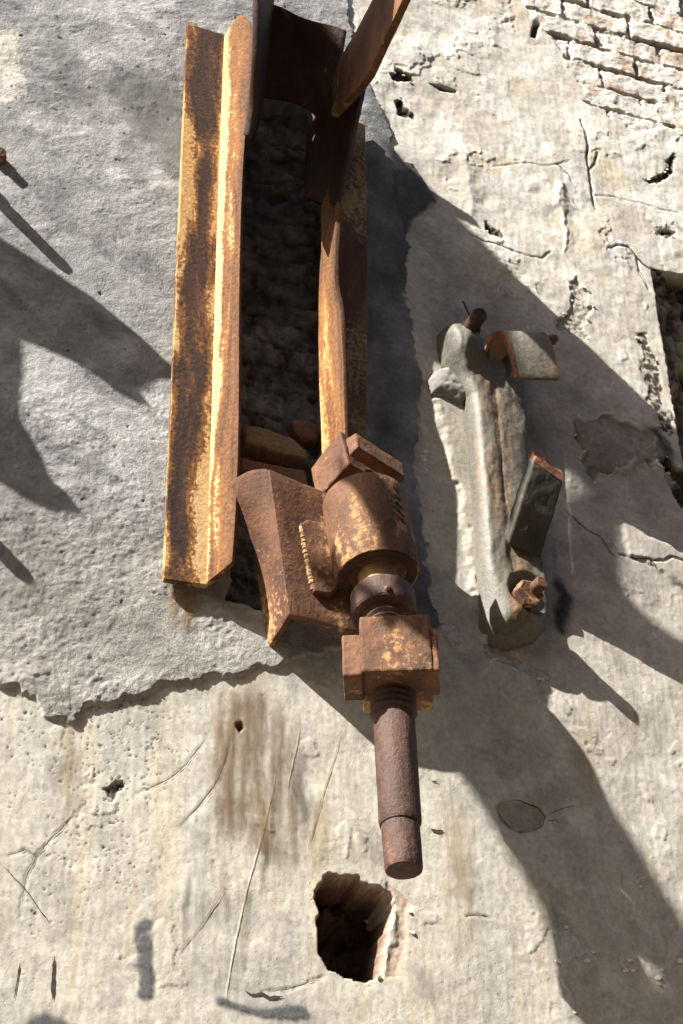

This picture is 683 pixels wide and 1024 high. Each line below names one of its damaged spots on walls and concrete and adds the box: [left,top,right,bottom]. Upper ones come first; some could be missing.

flaking render [526,0,683,134]
crack [502,123,677,212]
crack [613,245,674,288]
peeling [635,332,673,436]
crack [569,514,681,569]
crack [0,806,83,924]
spalling [314,874,415,983]